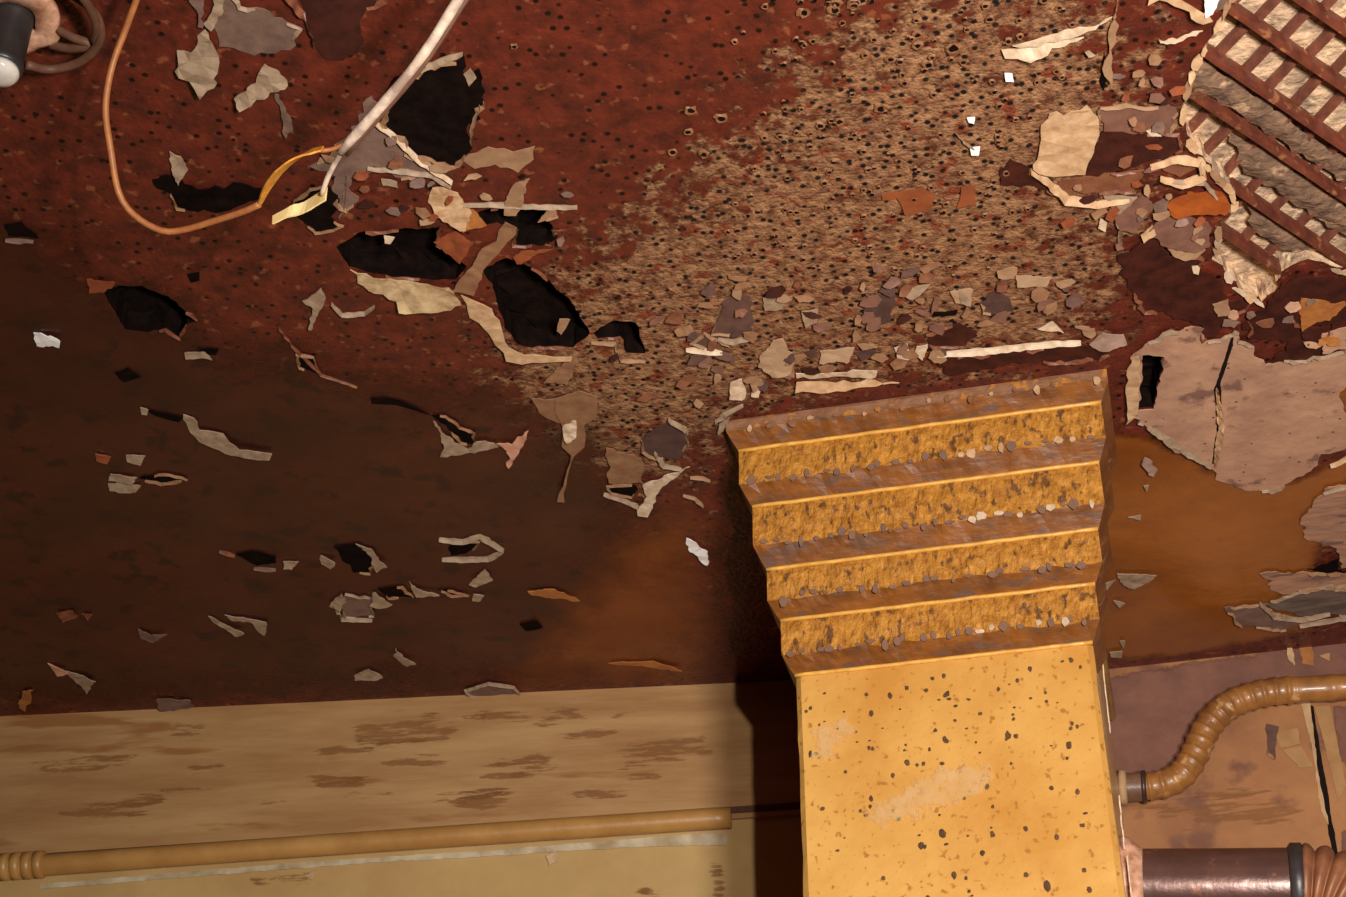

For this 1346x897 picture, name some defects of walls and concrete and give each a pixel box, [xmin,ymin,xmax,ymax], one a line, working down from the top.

peeling [175,0,387,138]
peeling [153,151,263,213]
flaking render [291,0,1346,494]
peeling [34,332,60,348]
peeling [140,407,272,461]
peeling [603,418,710,518]
crack [1212,337,1234,468]
peeling [319,534,504,623]
peeling [686,538,709,566]
flaking render [1225,484,1346,632]
peeling [1102,640,1346,773]
crack [1301,702,1346,855]